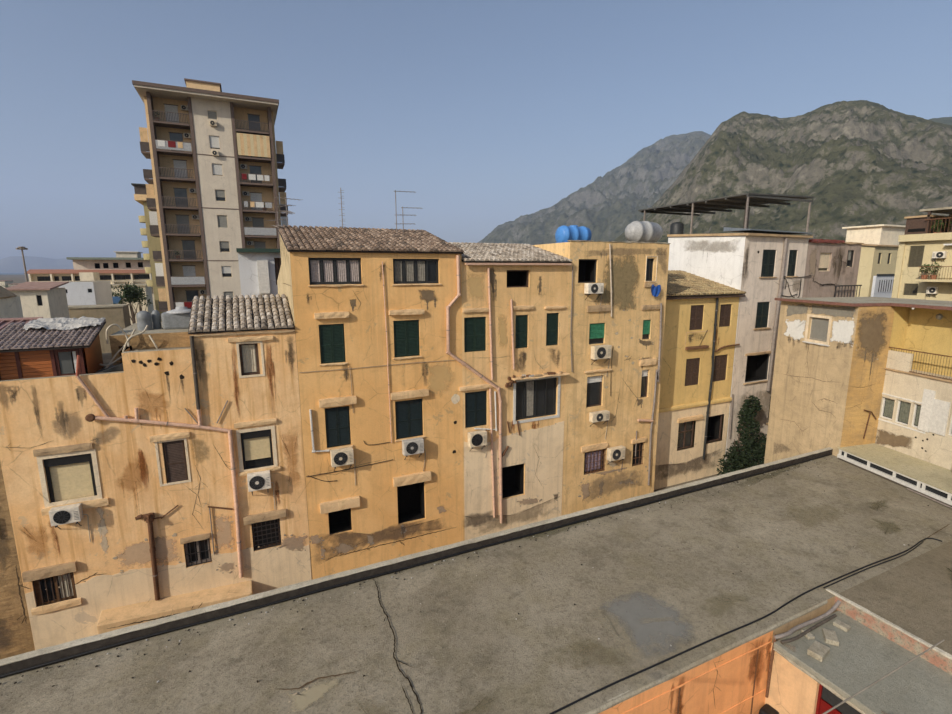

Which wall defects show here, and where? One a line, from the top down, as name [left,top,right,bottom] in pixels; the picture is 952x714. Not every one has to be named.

damp [596,254,640,311]
peeling [784,304,819,340]
flaking render [275,534,357,559]
crack [323,527,456,560]
crack [374,580,422,714]
spalling [281,670,365,713]